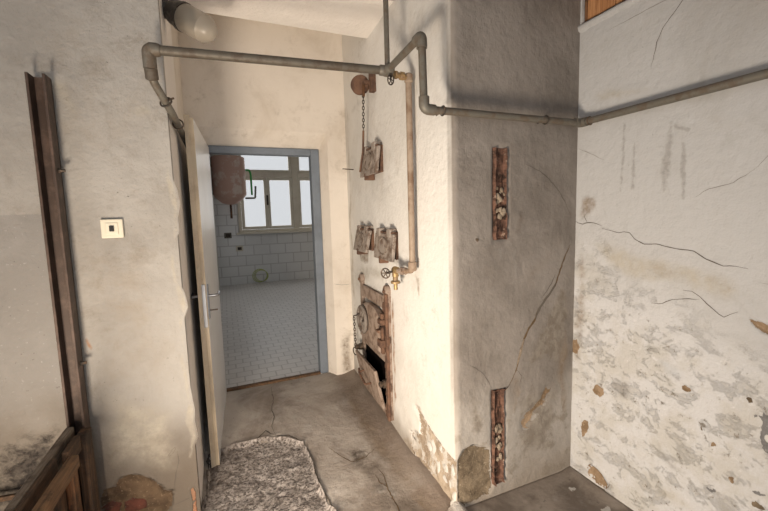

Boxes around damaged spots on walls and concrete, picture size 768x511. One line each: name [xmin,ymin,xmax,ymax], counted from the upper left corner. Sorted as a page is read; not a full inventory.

crack [608,0,683,62]
crack [526,164,747,269]
crack [471,245,570,389]
crack [656,290,736,317]
flaking render [748,317,768,335]
damp [0,418,67,511]
flaking render [100,473,175,511]
crack [331,448,400,511]
flaking render [411,372,493,505]
flaking render [581,419,589,437]
flaking render [748,490,768,511]
peeling [754,412,768,454]